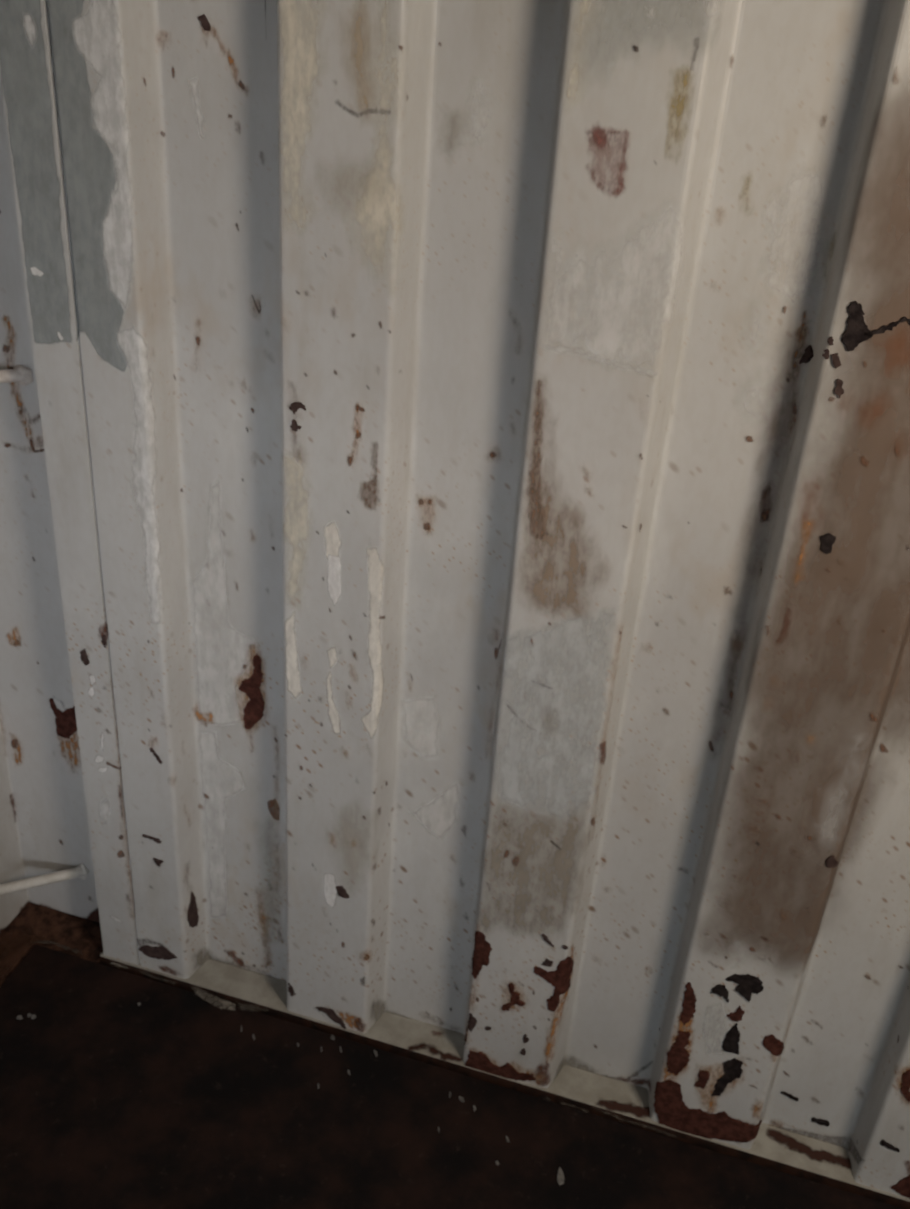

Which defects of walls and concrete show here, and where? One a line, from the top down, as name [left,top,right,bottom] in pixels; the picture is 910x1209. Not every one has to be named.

damp [528,381,586,610]
damp [724,120,910,961]
rust [408,1031,538,1081]
rust [763,1034,784,1056]
rust [898,1068,910,1103]
rust [597,1079,852,1169]
rust [891,1161,910,1198]